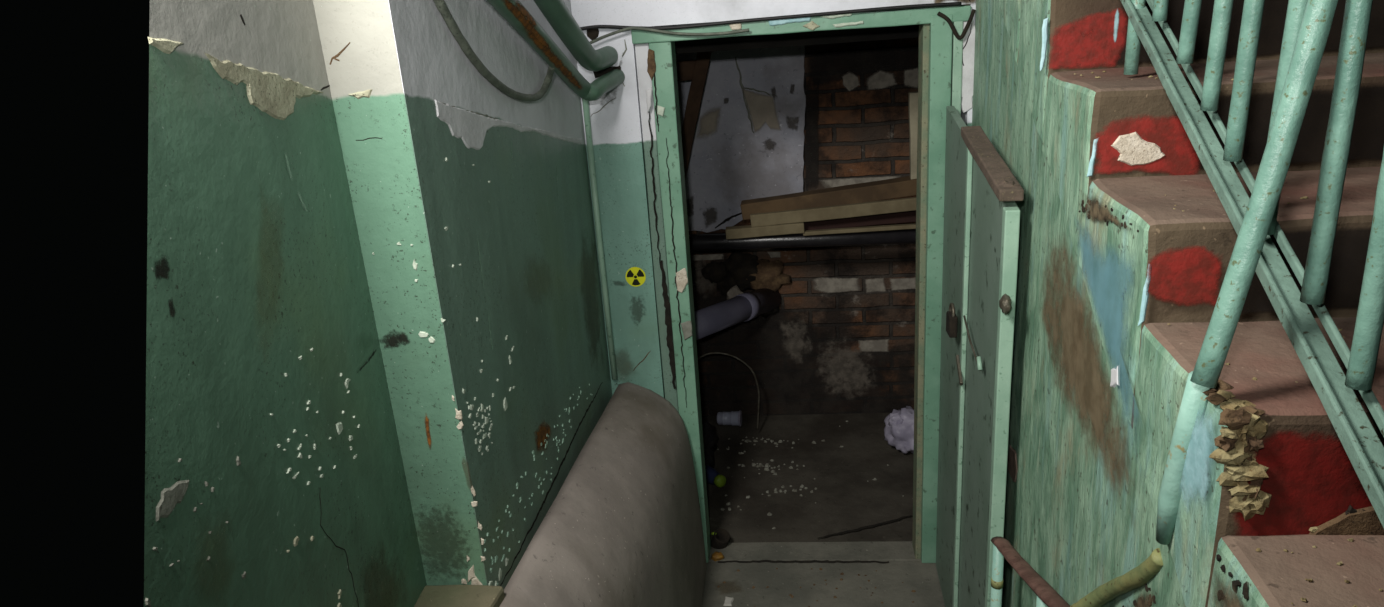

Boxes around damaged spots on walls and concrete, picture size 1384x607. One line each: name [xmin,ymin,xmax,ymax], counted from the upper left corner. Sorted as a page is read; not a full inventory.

peeling [148,37,183,54]
peeling [205,53,323,120]
peeling [435,100,583,166]
peeling [452,360,515,455]
peeling [156,480,215,521]
peeling [277,411,360,485]
peeling [461,384,593,586]
spalling [1181,380,1272,521]